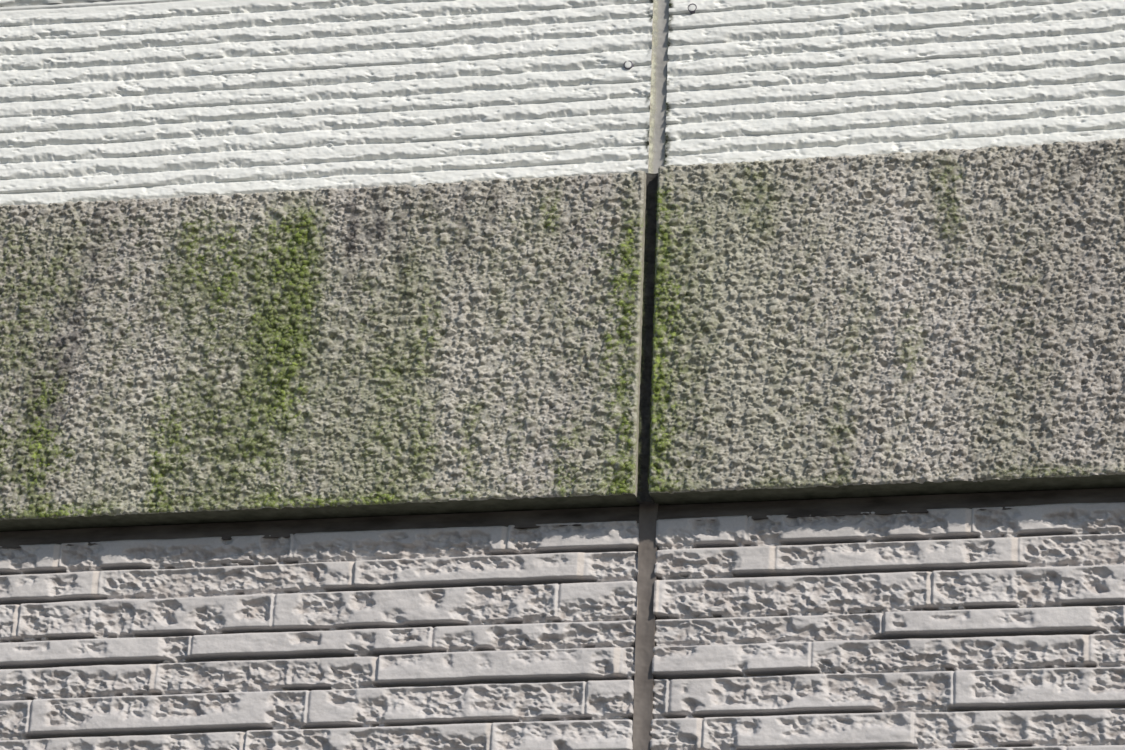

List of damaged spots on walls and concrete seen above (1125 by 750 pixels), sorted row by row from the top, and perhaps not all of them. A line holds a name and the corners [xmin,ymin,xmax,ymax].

leakage [0,258,101,518]
leakage [147,400,207,513]
leakage [169,209,317,475]
leakage [259,492,394,509]
leakage [606,415,635,495]
leakage [605,224,641,403]
leakage [648,191,687,492]